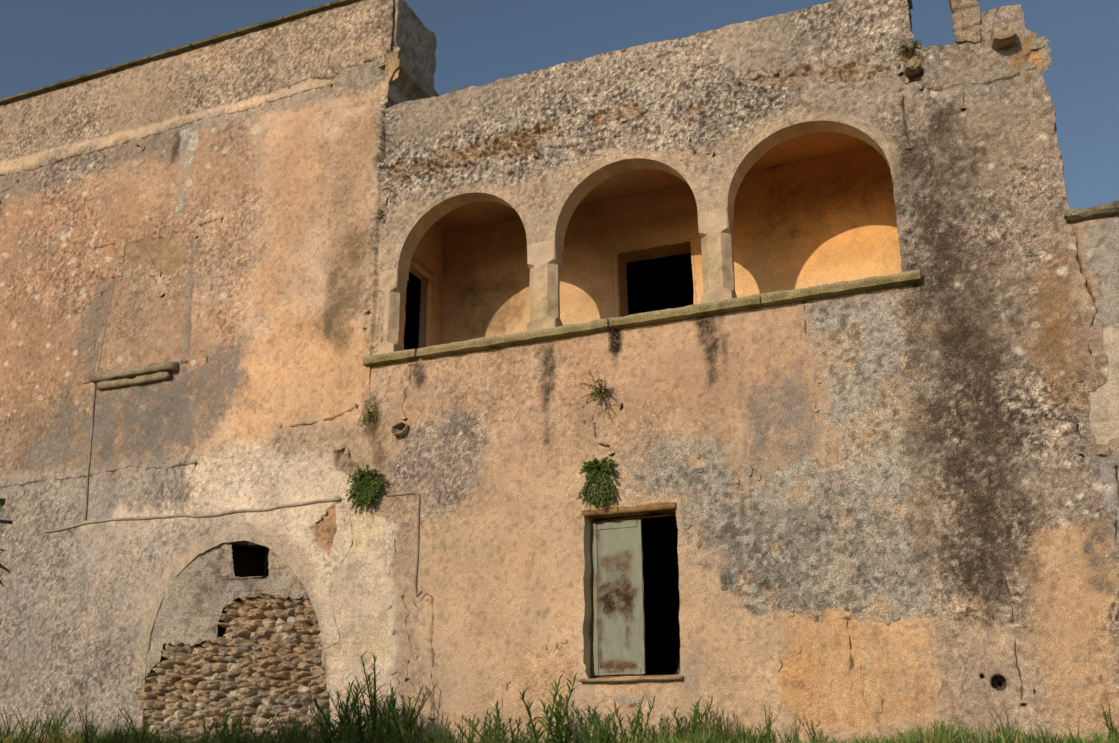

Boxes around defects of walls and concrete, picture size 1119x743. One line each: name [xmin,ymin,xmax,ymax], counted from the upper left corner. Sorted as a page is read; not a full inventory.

crack [893,60,1038,149]
leakage [541,348,554,403]
leakage [696,316,726,382]
leakage [900,108,1032,592]
crack [1067,235,1119,567]
peeling [611,258,967,740]
peeling [304,443,401,719]
spalling [493,634,588,743]
corrosion [597,553,636,623]
corrosion [599,638,636,671]
crack [839,620,877,743]
crack [995,570,1034,703]